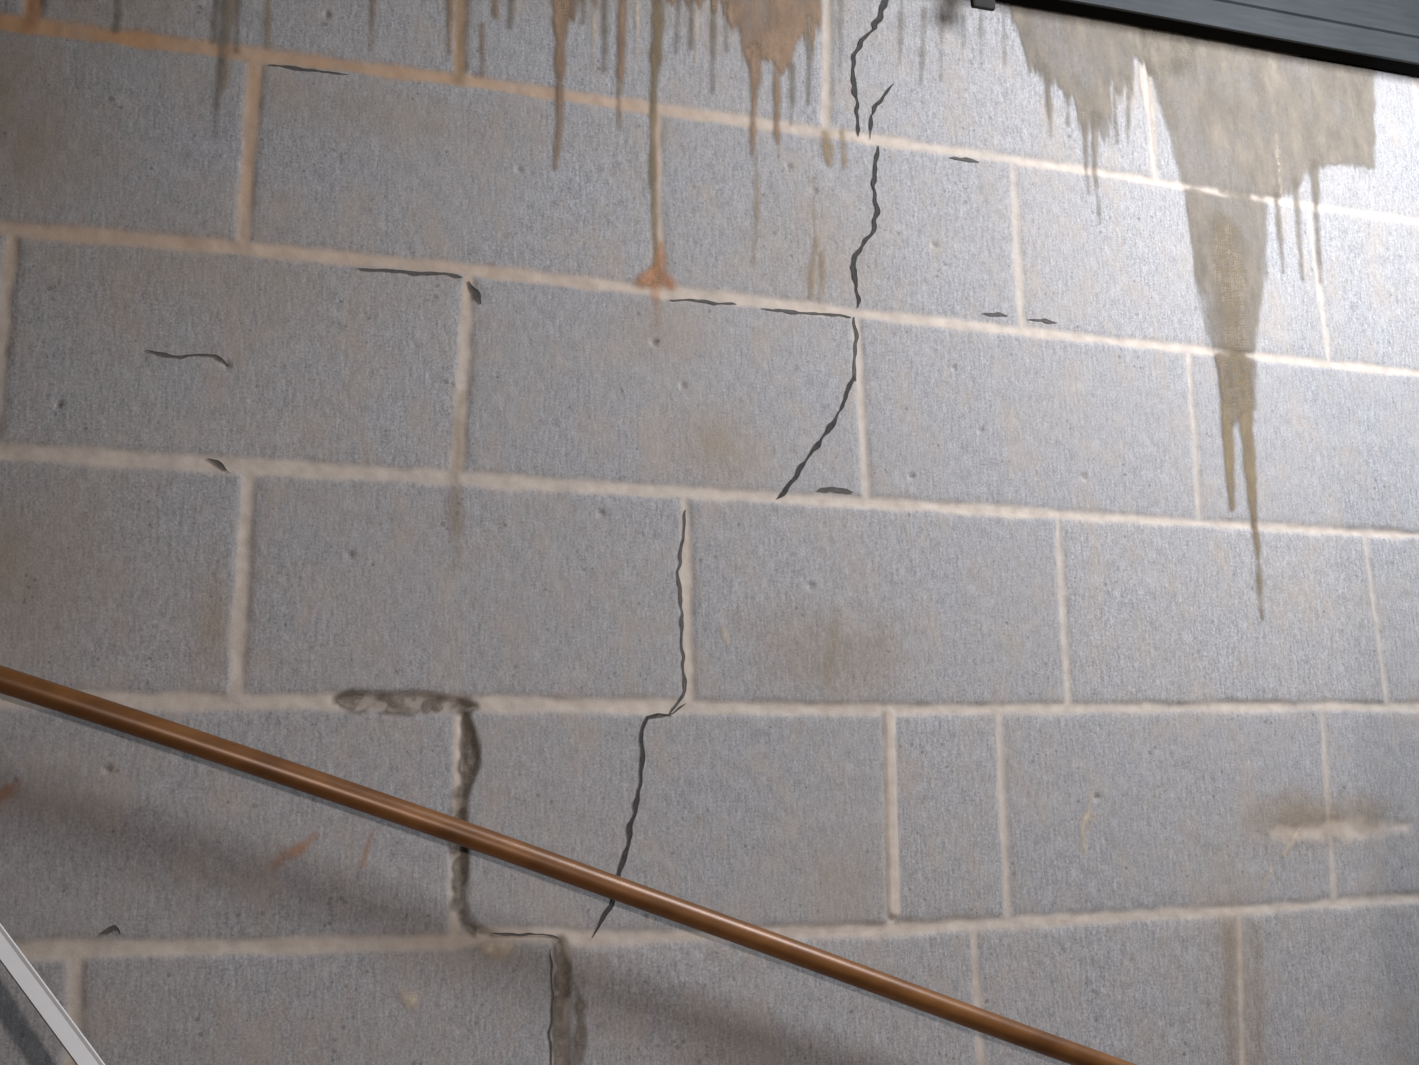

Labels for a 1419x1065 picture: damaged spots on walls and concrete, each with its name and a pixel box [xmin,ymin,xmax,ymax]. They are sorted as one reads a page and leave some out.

crack [146,350,228,366]
water stain [553,0,822,282]
crack [777,0,894,499]
water stain [1010,4,1375,593]
crack [592,510,687,938]